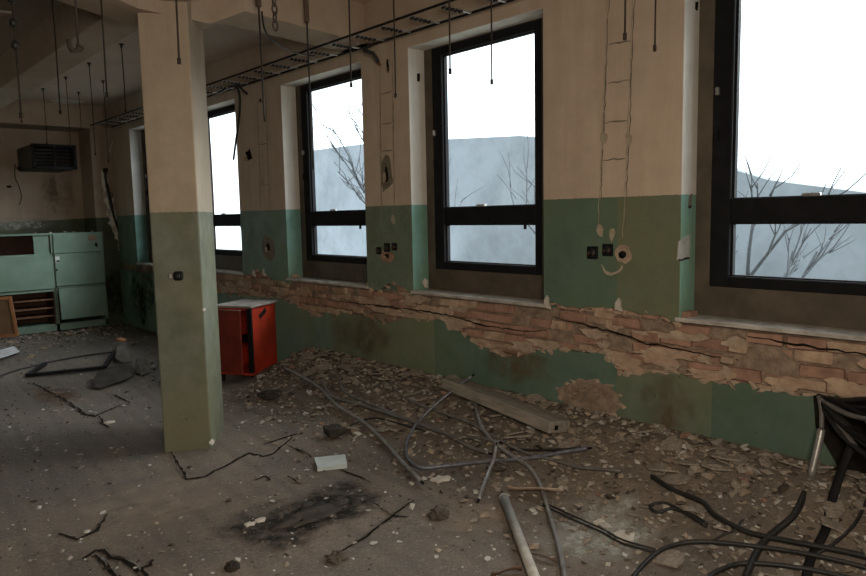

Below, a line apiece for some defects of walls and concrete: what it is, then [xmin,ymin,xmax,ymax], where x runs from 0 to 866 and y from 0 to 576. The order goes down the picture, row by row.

spalling [216,235,866,398]